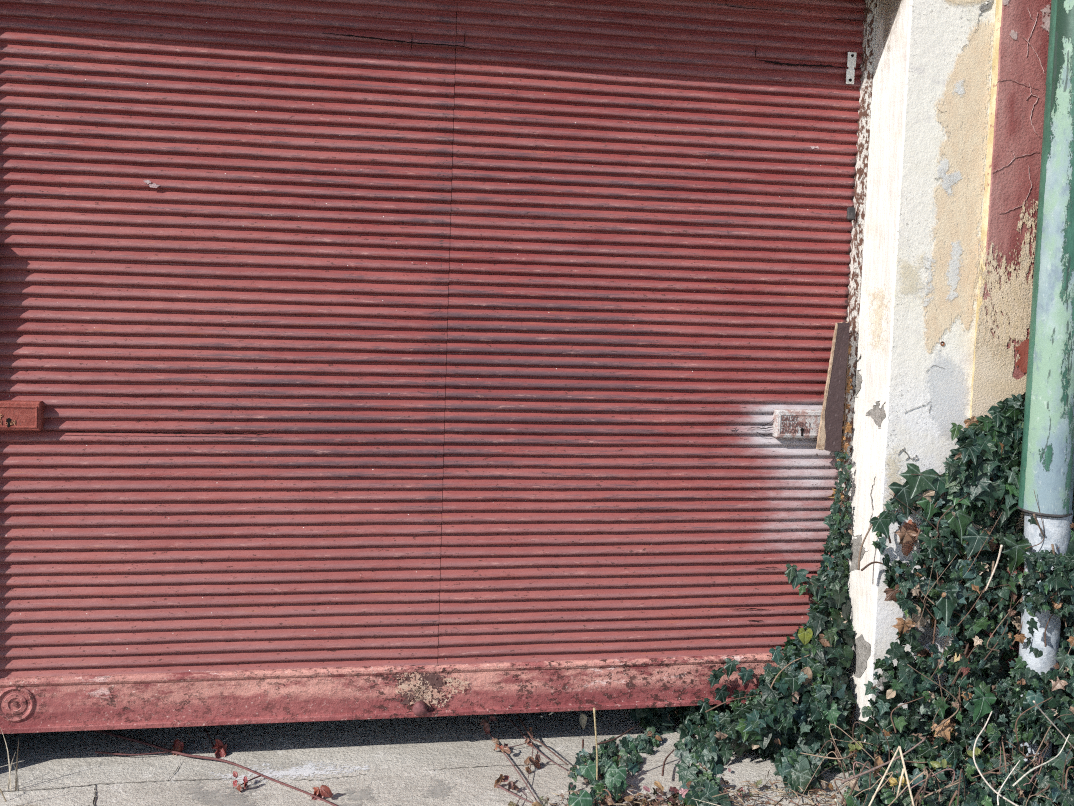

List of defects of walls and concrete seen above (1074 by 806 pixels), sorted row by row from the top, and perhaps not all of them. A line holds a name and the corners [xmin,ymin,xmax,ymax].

peeling [900,0,1038,418]
peeling [969,511,1025,542]